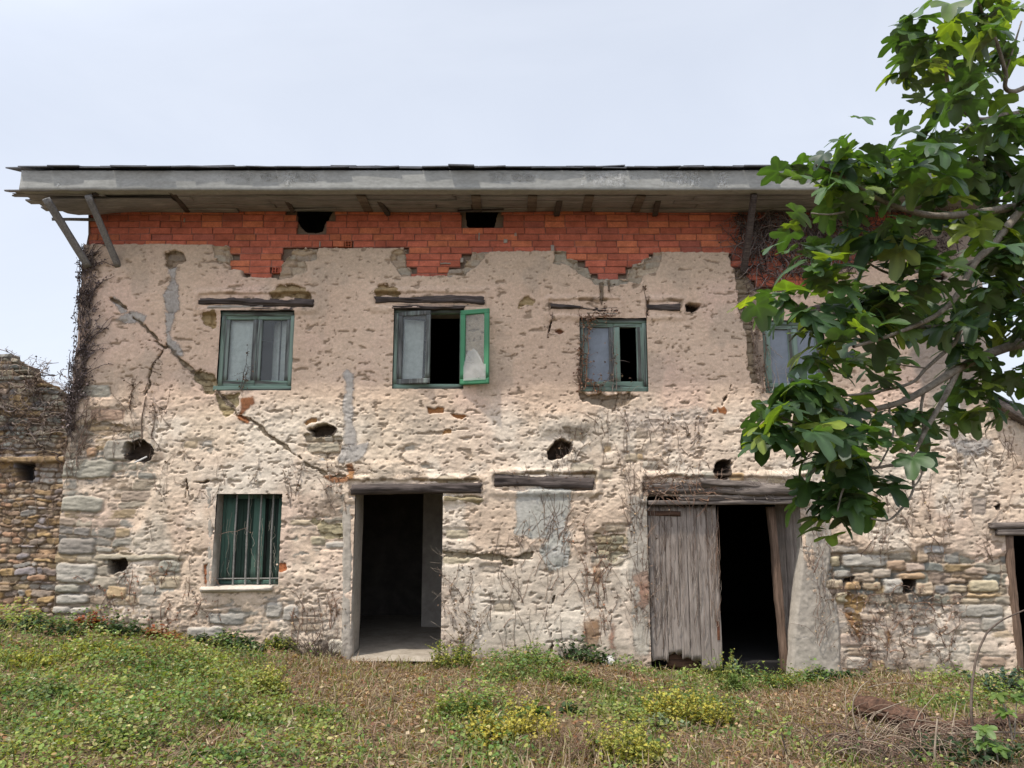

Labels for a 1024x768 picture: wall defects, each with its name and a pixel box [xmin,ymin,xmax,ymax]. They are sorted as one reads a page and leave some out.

spalling [269,247,318,299]
spalling [374,247,412,297]
spalling [447,252,489,277]
spalling [553,251,662,286]
crack [110,298,194,395]
crack [218,393,346,479]
spalling [844,576,865,629]
spalling [902,579,916,593]